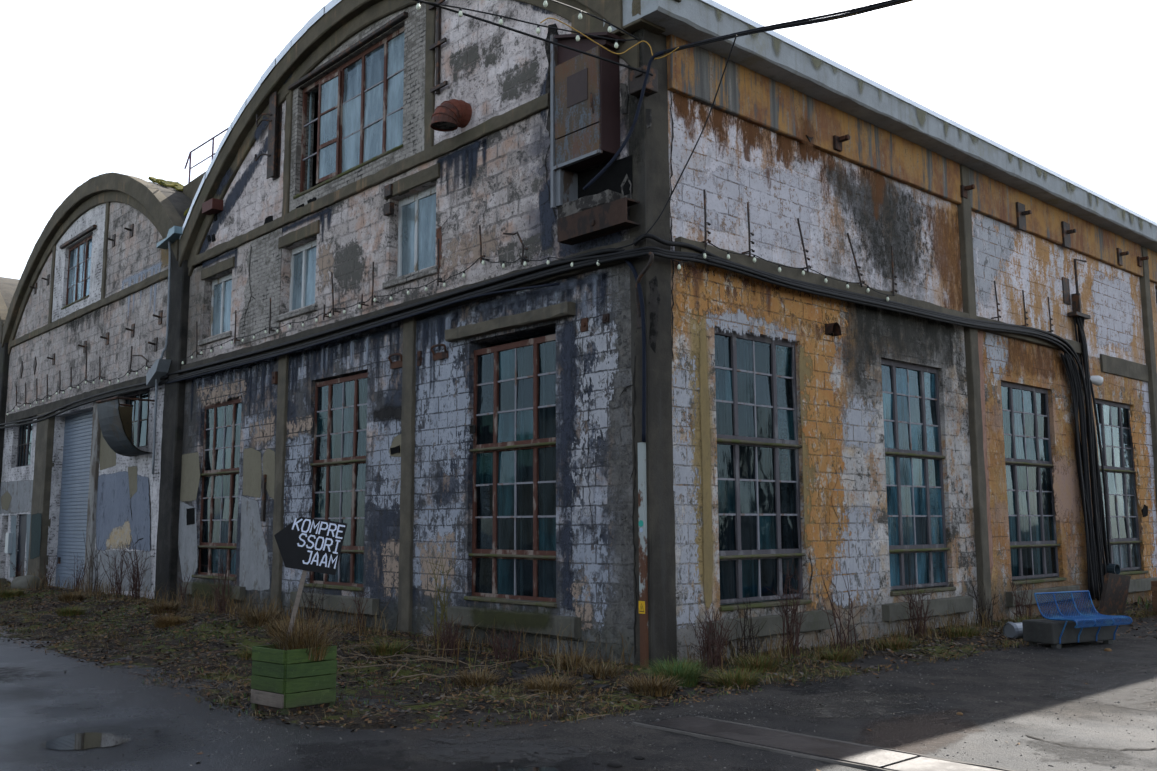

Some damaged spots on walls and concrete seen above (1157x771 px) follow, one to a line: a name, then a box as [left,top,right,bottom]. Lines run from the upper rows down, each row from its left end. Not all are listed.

spalling [545,24,559,93]
leakage [437,138,486,189]
rust [673,92,885,221]
leakage [827,165,934,284]
rust [676,264,811,312]
rust [1007,339,1068,382]
peeling [283,430,314,527]
peeling [368,320,473,590]
peeling [569,315,620,632]
peeling [842,396,878,455]
peeling [106,520,132,549]
peeling [831,498,881,608]